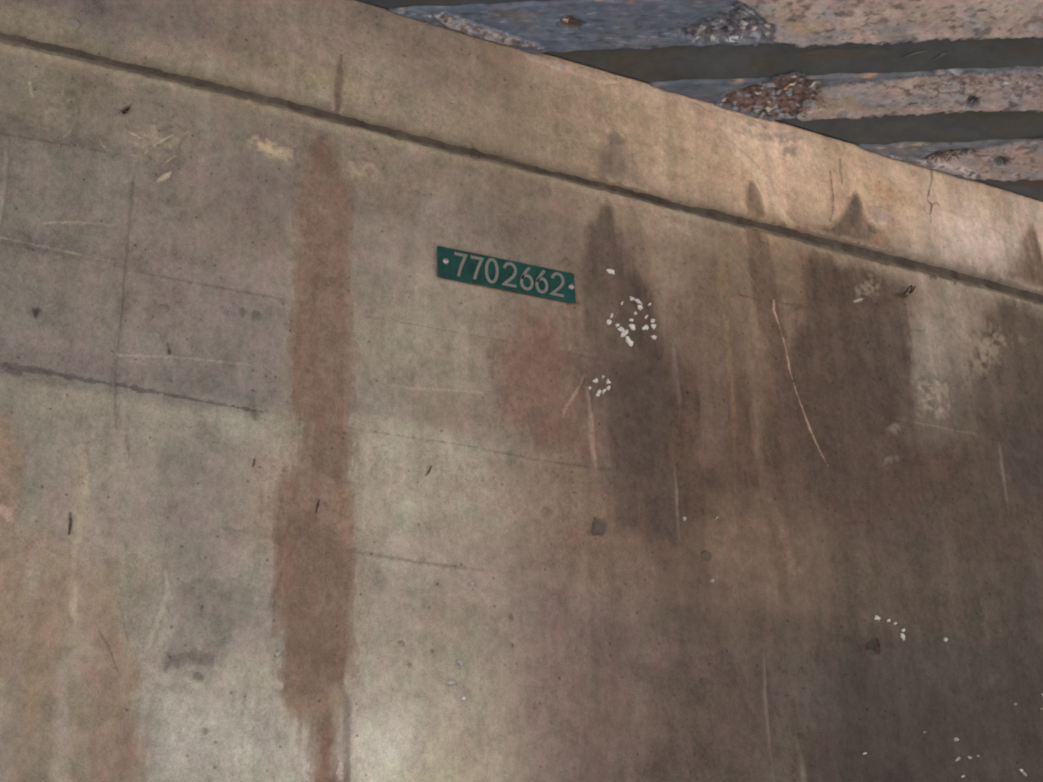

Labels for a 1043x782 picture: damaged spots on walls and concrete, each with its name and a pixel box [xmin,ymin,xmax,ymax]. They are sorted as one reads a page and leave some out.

peeling [667,0,1043,48]
damp [591,128,649,192]
peeling [675,68,1043,160]
peeling [884,138,1043,182]
damp [561,140,1043,584]
corrosion [236,129,379,782]
corrosion [0,404,162,782]
damp [591,637,775,782]
damp [824,645,1043,782]